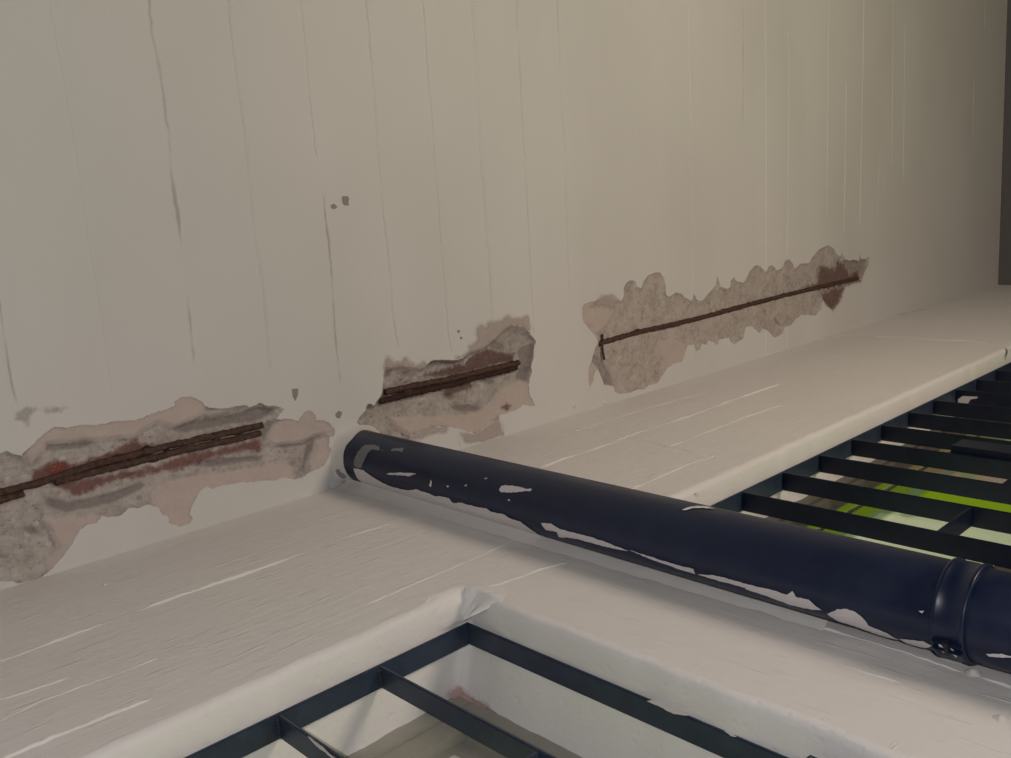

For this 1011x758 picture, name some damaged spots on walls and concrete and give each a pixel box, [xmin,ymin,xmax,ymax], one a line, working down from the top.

spalling [357,316,536,442]
spalling [582,245,869,394]
spalling [0,397,342,583]